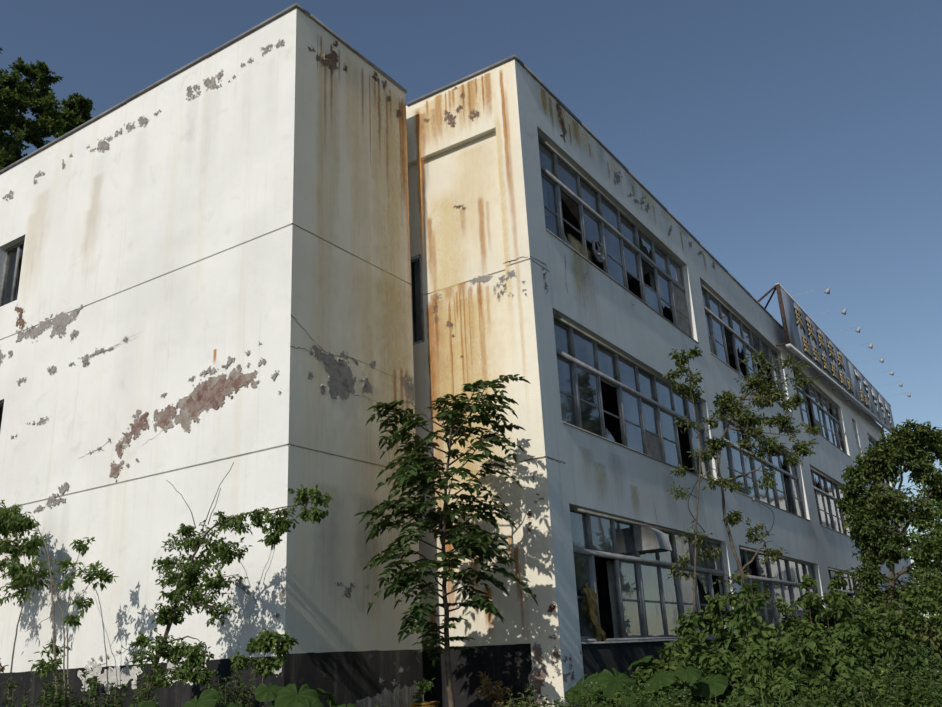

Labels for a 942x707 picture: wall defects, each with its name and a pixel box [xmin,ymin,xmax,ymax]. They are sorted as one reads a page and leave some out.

peeling [186,39,284,100]
peeling [86,109,161,153]
flaking render [444,87,479,128]
rust [400,73,509,260]
peeling [470,268,527,297]
flaking render [0,304,84,366]
peeling [69,346,113,367]
flaking render [308,345,377,400]
rust [428,291,473,472]
peeling [89,351,281,482]
flaking render [528,635,583,704]